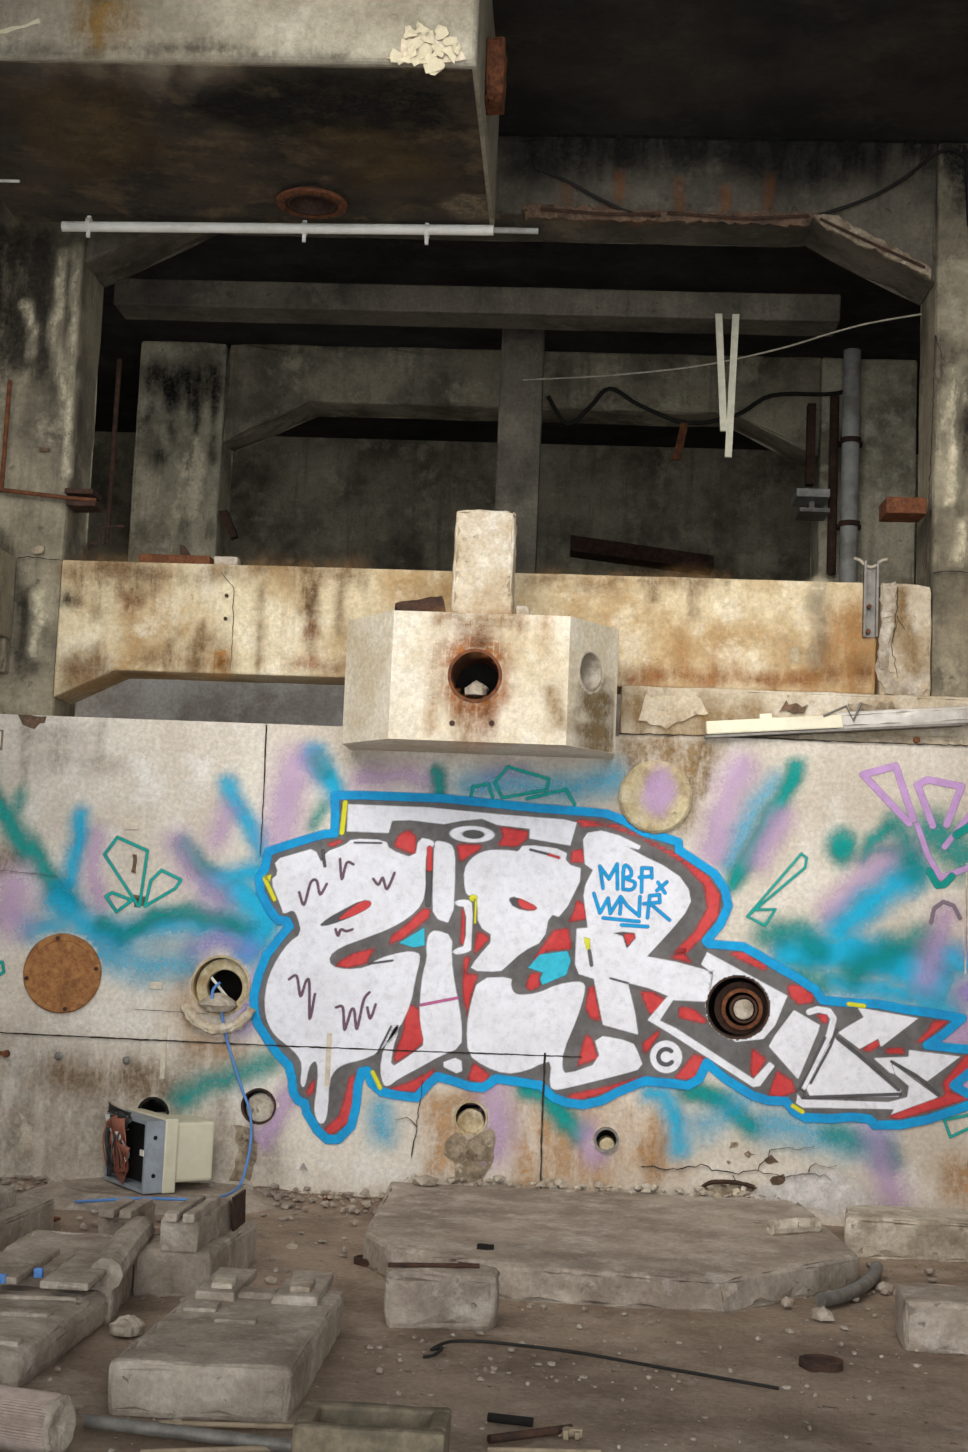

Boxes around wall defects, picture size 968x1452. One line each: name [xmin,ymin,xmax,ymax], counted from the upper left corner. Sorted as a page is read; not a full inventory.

corrosion [114,554,226,608]
corrosion [438,612,512,666]
corrosion [447,685,506,716]
crack [641,1146,837,1188]